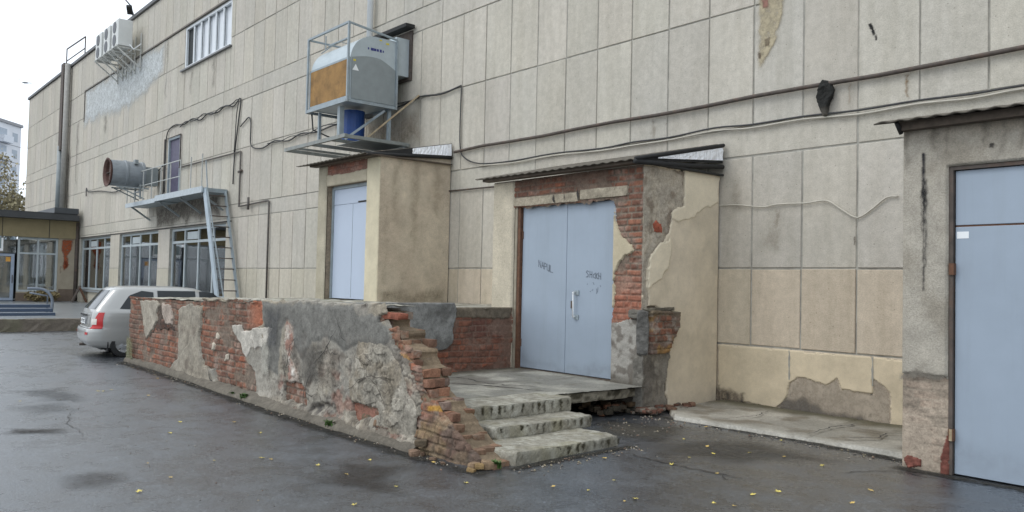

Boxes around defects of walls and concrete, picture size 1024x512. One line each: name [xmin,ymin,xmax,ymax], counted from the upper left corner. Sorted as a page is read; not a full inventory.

peeling [758,0,783,64]
spalling [60,240,72,272]
spalling [514,165,720,323]
spalling [129,296,270,392]
peeling [284,321,307,406]
spalling [437,307,513,372]
spalling [354,403,377,421]
spalling [718,344,949,475]